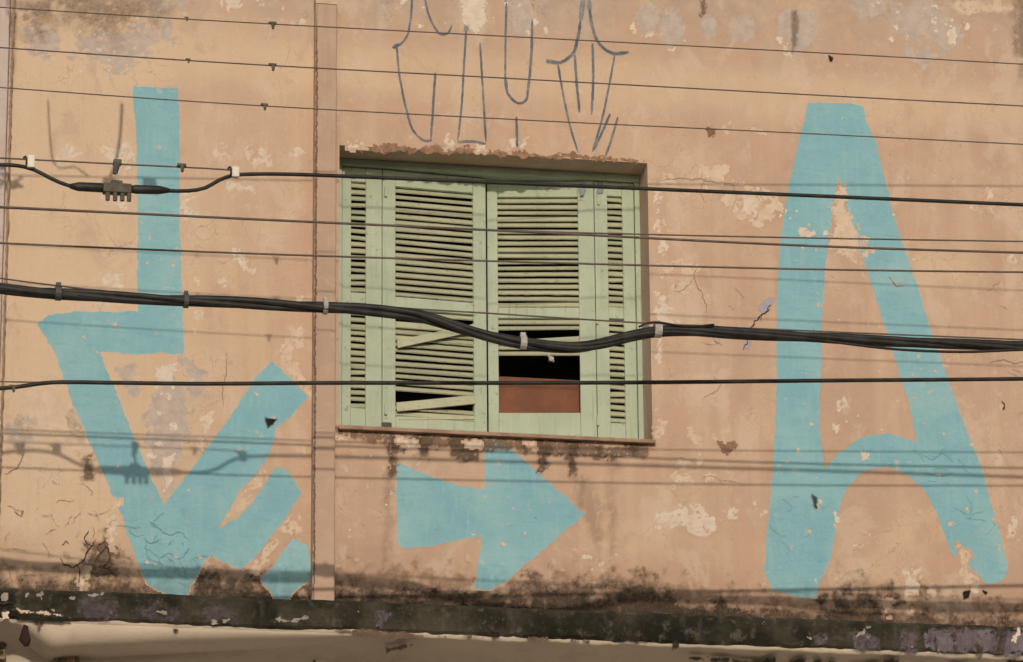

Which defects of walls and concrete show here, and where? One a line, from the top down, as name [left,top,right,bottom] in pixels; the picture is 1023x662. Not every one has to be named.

peeling [19,0,187,82]
peeling [845,0,1023,73]
crack [665,177,737,208]
peeling [798,183,875,264]
crack [0,0,207,605]
crack [676,265,739,314]
peeling [648,162,798,378]
crack [702,305,771,350]
peeling [108,352,218,498]
water stain [335,426,648,477]
water stain [334,573,986,651]
peeling [883,626,1023,662]